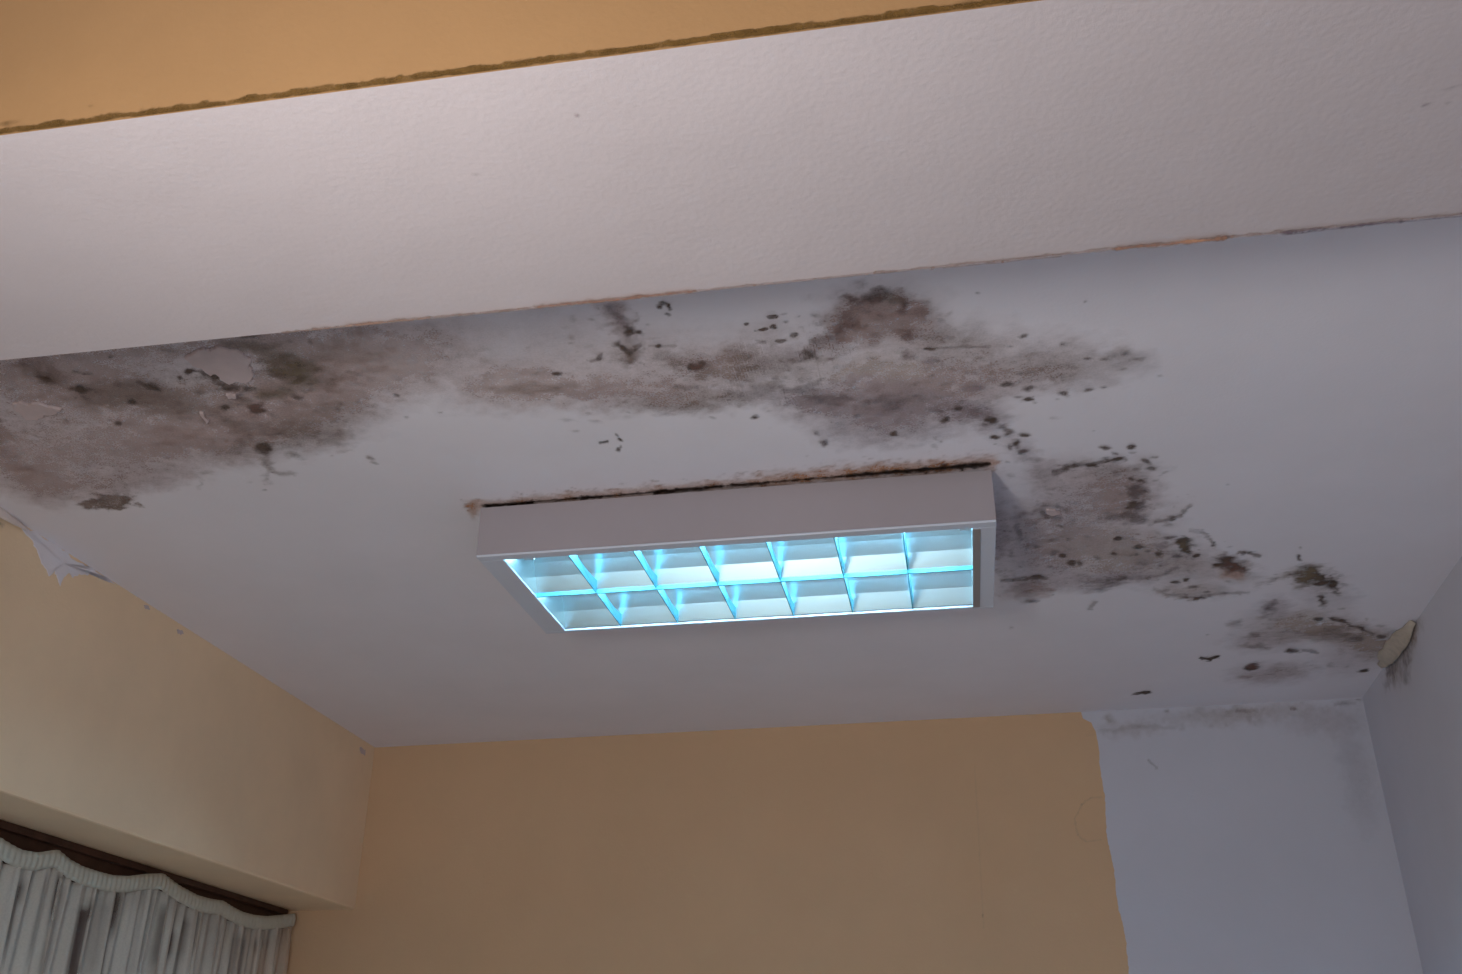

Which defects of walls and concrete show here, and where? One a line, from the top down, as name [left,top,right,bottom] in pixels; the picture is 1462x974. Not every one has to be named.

water stain [0,326,448,510]
water stain [467,307,768,410]
water stain [744,288,1074,454]
water stain [998,445,1259,602]
water stain [1265,555,1386,672]